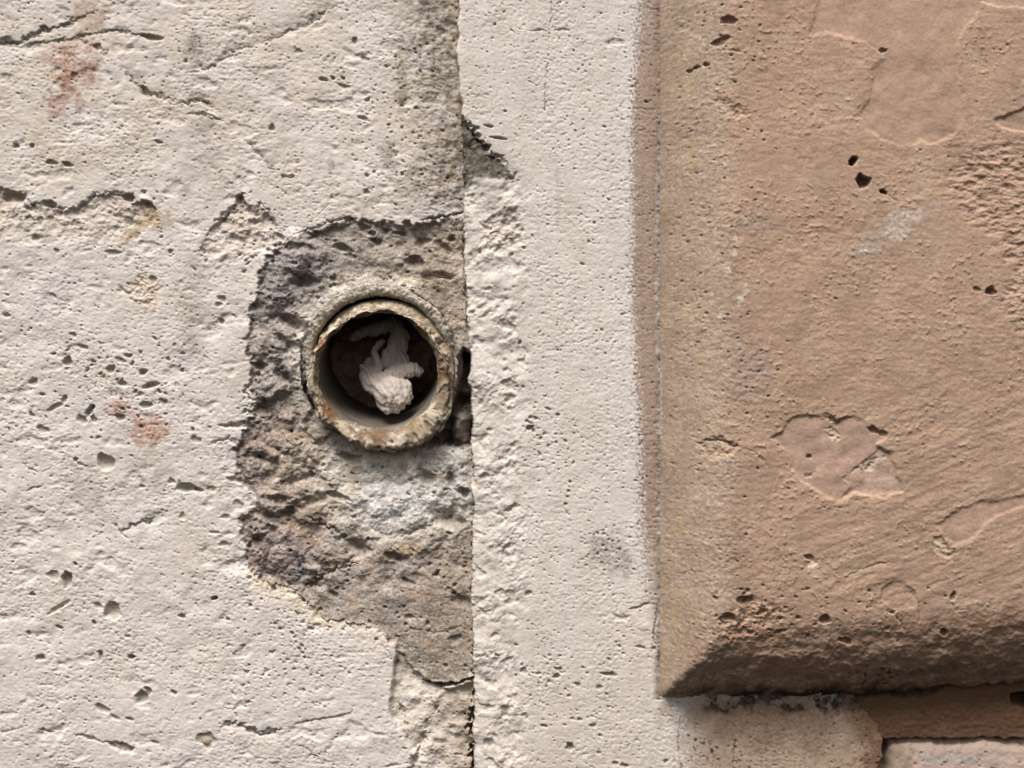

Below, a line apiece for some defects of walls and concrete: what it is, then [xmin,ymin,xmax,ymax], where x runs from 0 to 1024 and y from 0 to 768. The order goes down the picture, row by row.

crack [0,6,339,120]
spalling [461,115,515,186]
spalling [423,346,473,452]
peeling [769,413,906,505]
peeling [240,650,277,692]
spalling [247,567,475,768]